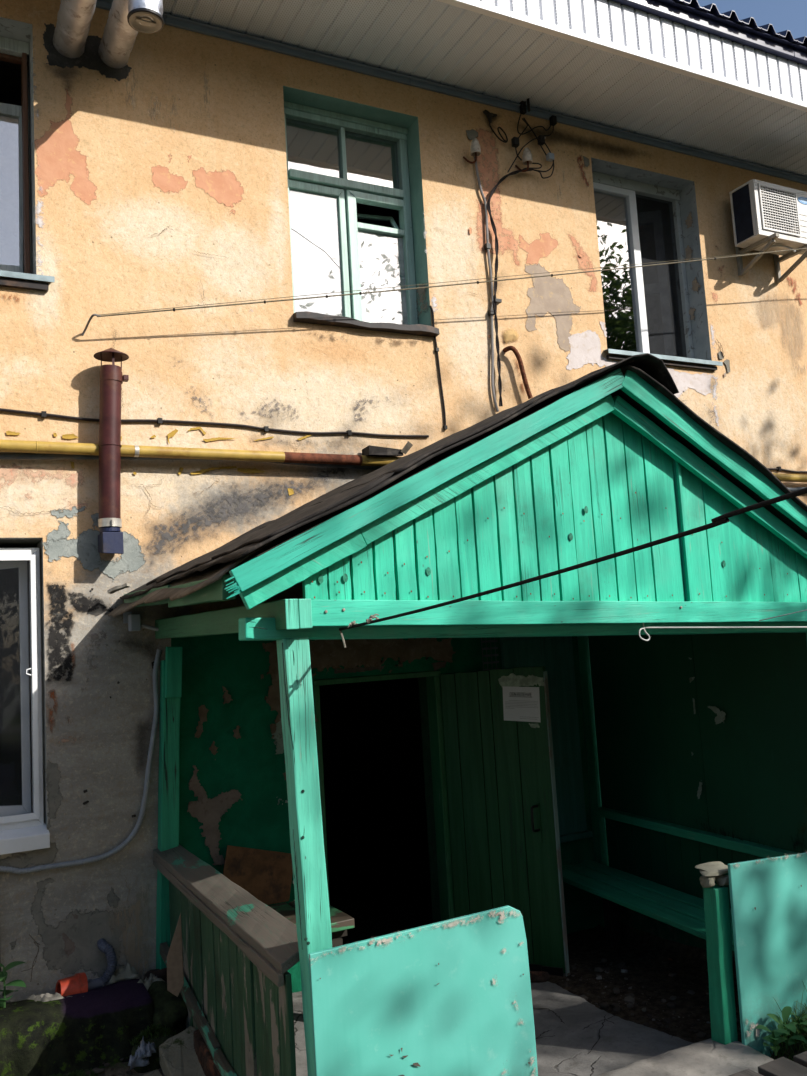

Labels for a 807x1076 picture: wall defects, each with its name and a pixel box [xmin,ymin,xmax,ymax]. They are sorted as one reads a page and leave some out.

peeling [34,89,97,205]
peeling [151,155,244,215]
flaking render [466,110,617,370]
flaking render [667,351,730,398]
peeling [0,463,84,500]
leakage [147,467,347,564]
rust [284,452,363,465]
leakage [46,583,116,682]
flaking render [309,638,456,678]
flaking render [261,640,286,780]
flaking render [187,765,241,865]
crack [533,1008,564,1039]